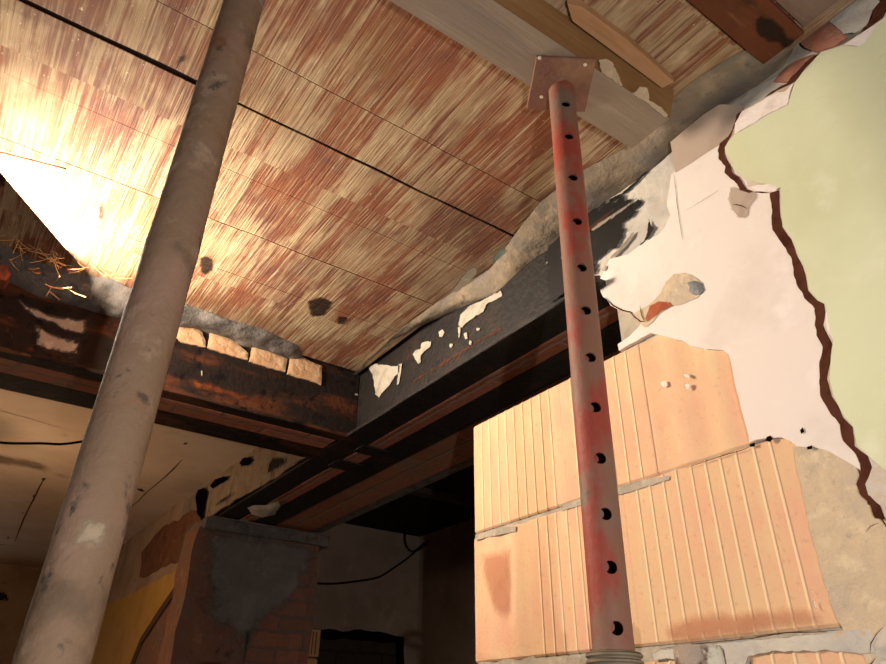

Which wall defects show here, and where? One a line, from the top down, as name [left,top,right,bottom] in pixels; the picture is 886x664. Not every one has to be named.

flaking render [774,22,849,83]
crack [844,0,886,47]
spalling [608,273,704,327]
crack [718,54,886,532]
crack [132,443,187,506]
peeling [139,447,305,578]
crack [697,630,836,663]